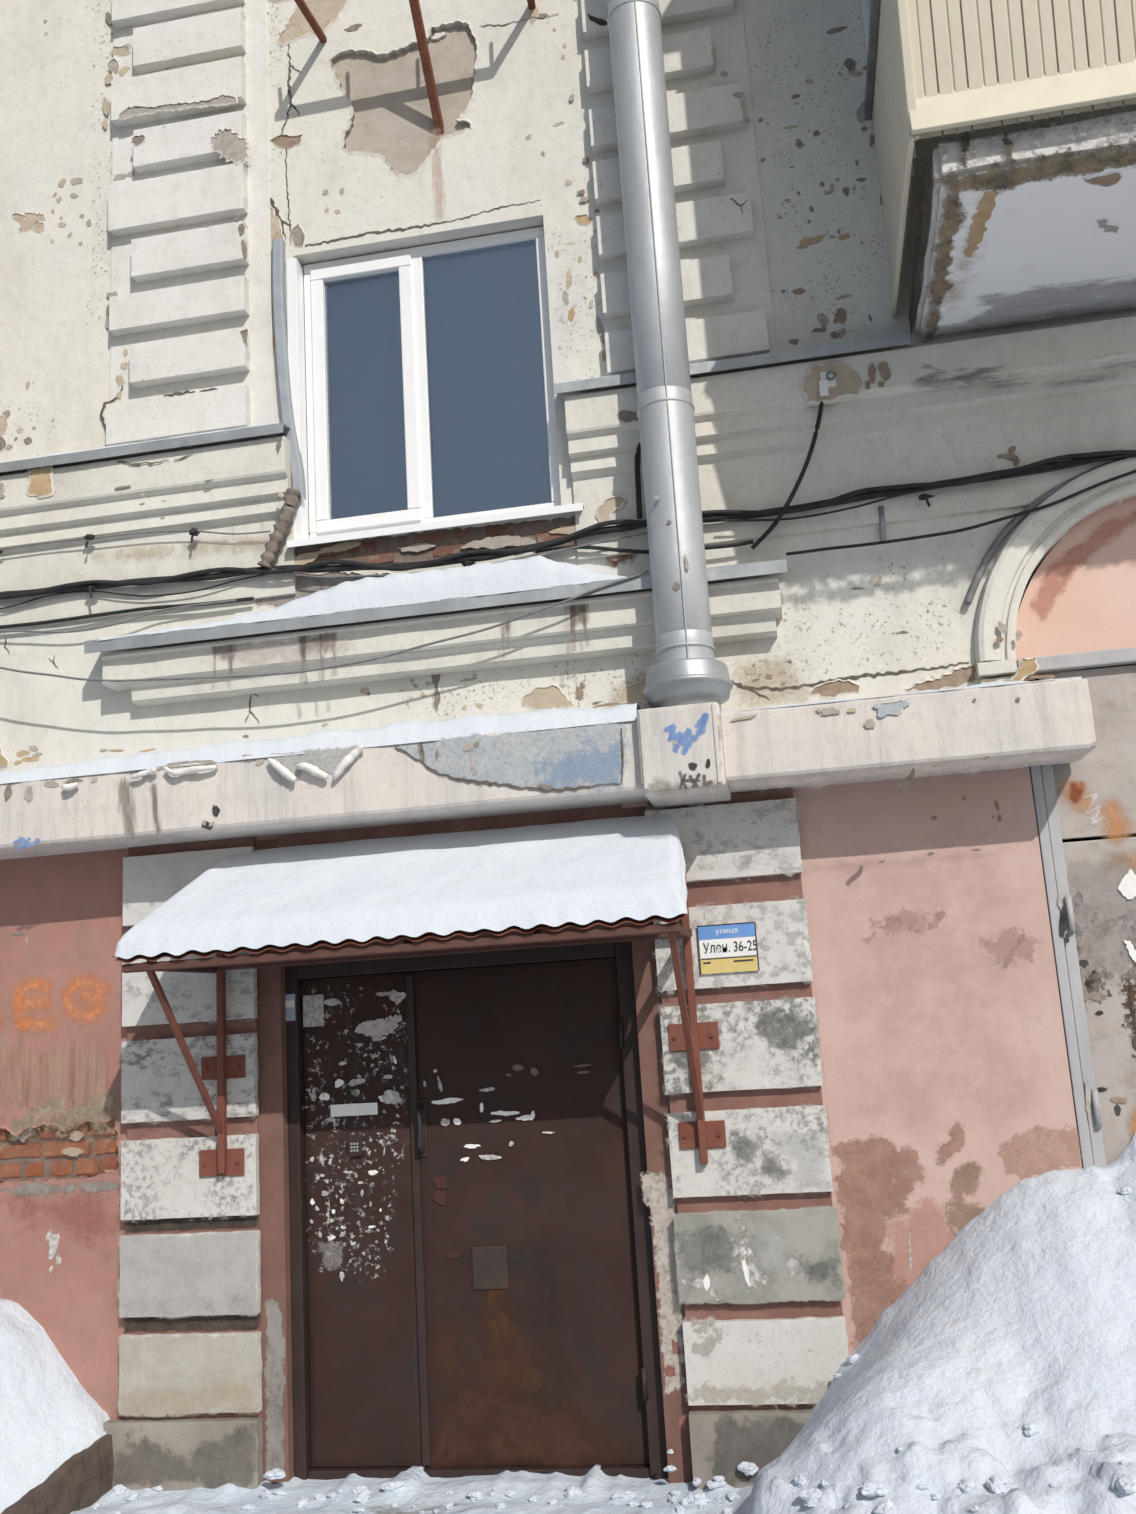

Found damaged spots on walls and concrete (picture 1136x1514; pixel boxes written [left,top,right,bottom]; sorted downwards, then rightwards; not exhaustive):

flaking render [267,0,481,178]
crack [270,44,540,247]
peeling [711,9,884,345]
flaking render [962,189,1000,258]
water stain [214,645,235,675]
water stain [299,633,337,684]
peeling [398,653,650,790]
water stain [571,604,588,651]
crack [732,662,969,700]
peeling [1057,891,1136,1058]
flaking render [0,1101,183,1222]
peeling [640,1104,984,1394]